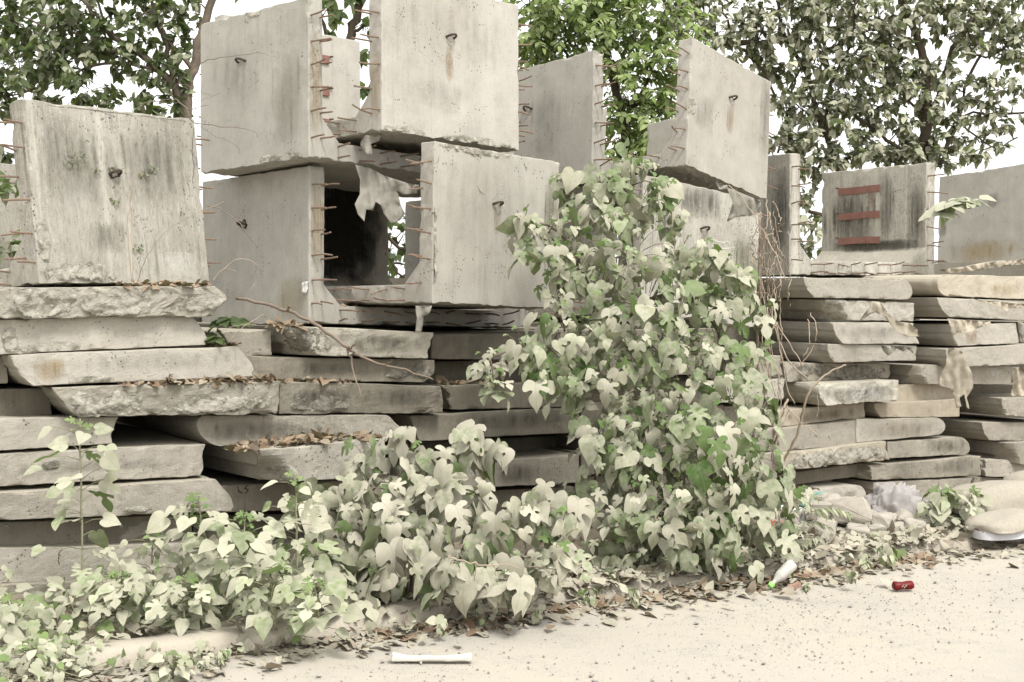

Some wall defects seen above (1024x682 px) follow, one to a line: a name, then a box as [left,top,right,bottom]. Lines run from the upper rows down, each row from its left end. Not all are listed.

spalling [0,257,151,318]